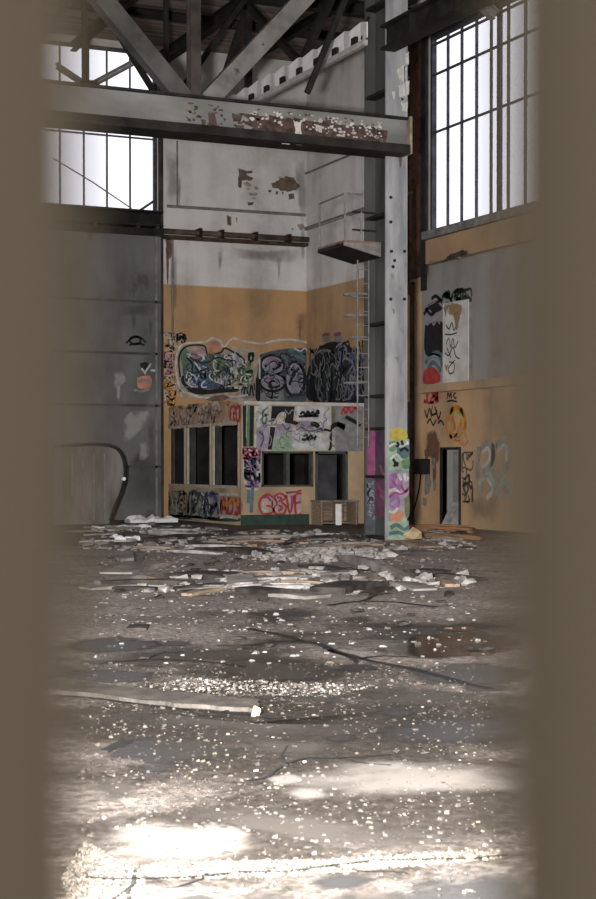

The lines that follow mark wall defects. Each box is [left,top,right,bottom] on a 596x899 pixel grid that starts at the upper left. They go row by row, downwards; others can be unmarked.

peeling [238,168,300,206]